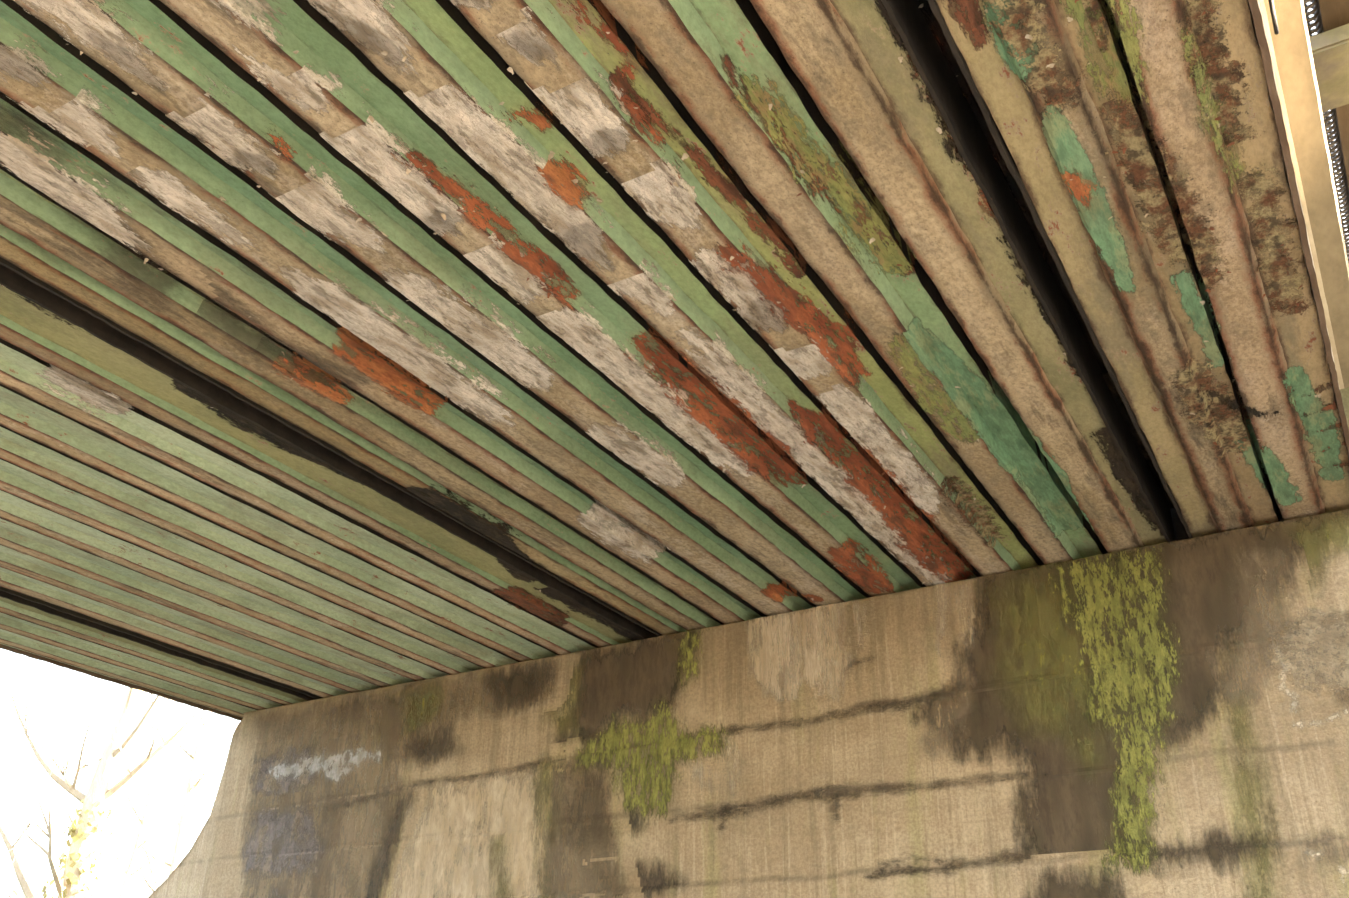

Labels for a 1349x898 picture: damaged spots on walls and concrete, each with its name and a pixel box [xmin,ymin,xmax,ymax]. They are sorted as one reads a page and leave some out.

peeling [14,0,171,95]
peeling [0,34,261,270]
peeling [210,0,346,114]
peeling [165,78,557,430]
peeling [307,0,424,75]
peeling [450,0,493,12]
peeling [491,6,703,231]
peeling [404,83,952,585]
water stain [1102,371,1159,485]
water stain [245,690,415,898]
water stain [399,484,695,898]
water stain [913,427,1349,898]